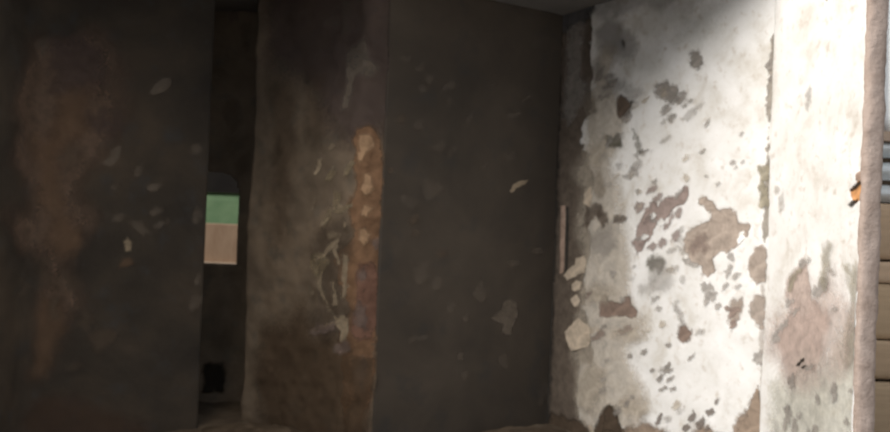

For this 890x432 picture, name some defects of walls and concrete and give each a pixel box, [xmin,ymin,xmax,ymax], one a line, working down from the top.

spalling [689,51,703,70]
spalling [642,81,692,115]
peeling [546,16,637,424]
damp [547,47,665,432]
spalling [632,174,750,329]
spalling [310,125,384,432]
spalling [665,325,692,347]
spalling [650,362,676,391]
damp [682,399,718,432]
damp [733,385,760,432]